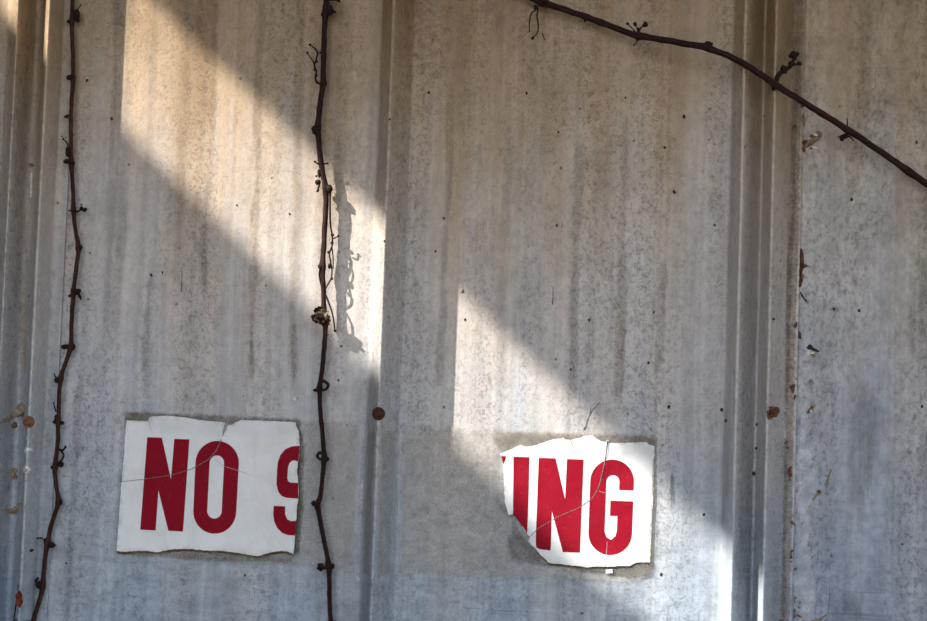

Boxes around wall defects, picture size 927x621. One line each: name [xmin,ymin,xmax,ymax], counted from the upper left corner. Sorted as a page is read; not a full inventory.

corrosion [766,406,780,420]